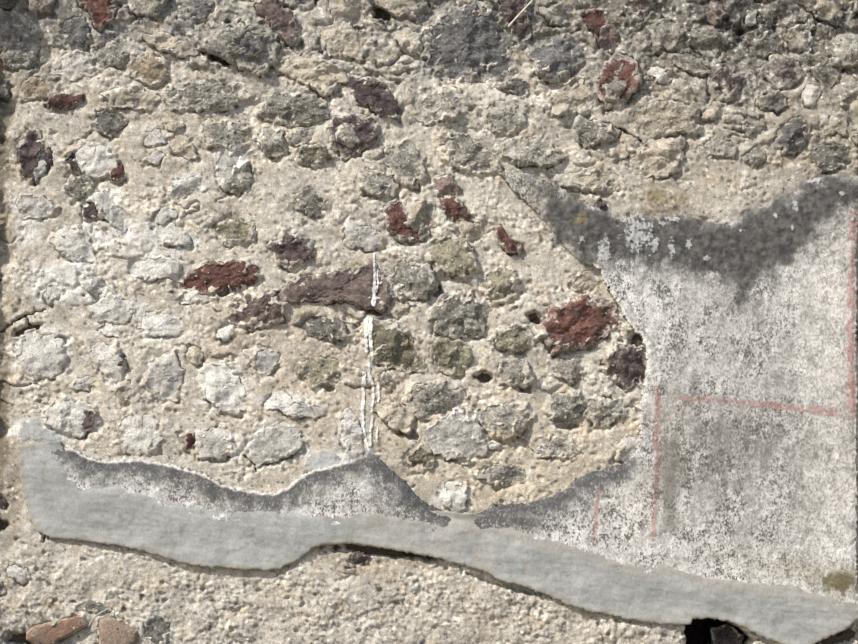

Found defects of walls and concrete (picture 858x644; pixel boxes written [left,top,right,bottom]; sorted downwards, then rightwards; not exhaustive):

peeling [18,170,858,644]
water stain [546,175,858,304]